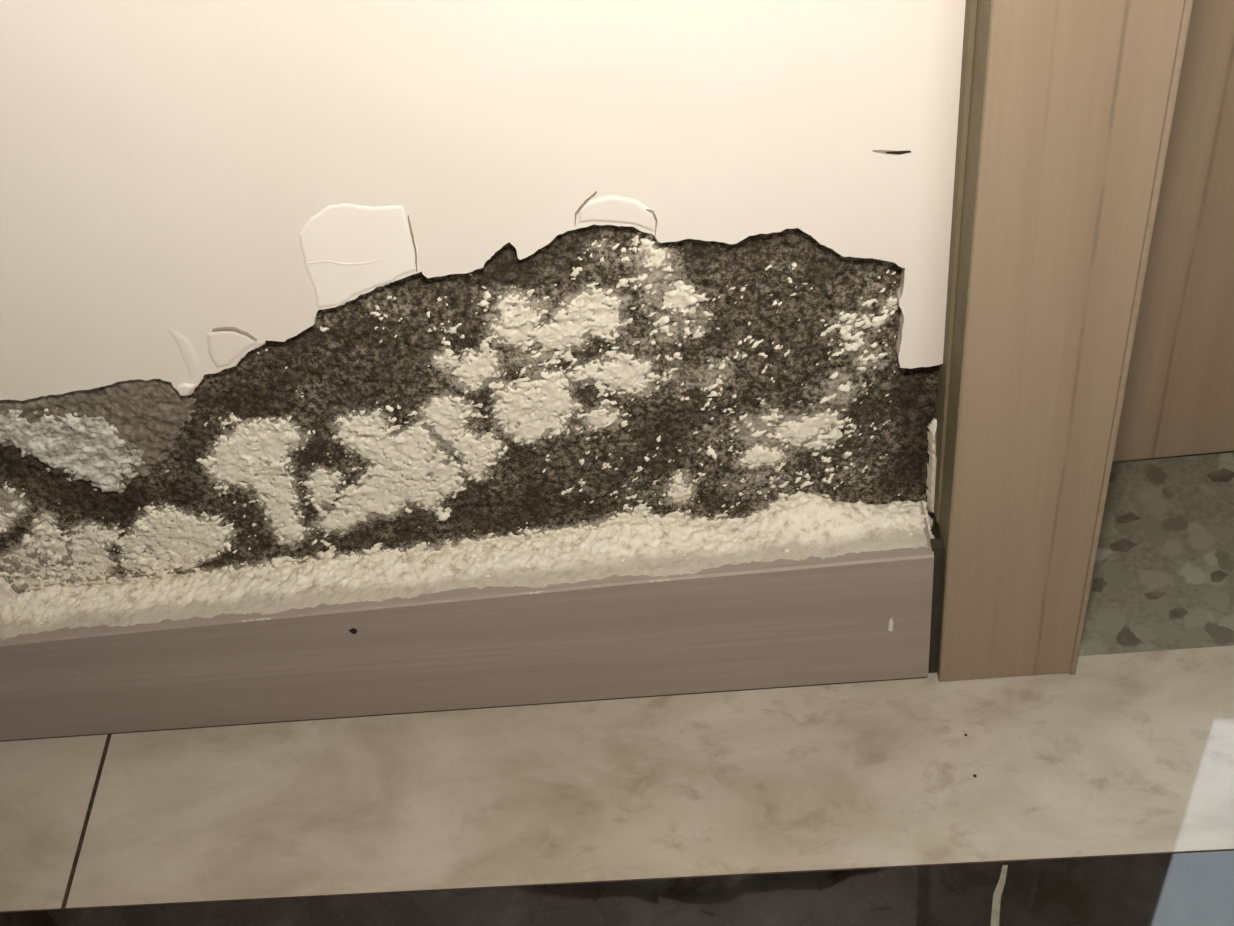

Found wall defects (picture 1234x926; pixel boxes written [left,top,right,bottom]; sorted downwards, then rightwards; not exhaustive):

crack [872,148,911,156]
spalling [0,195,939,594]